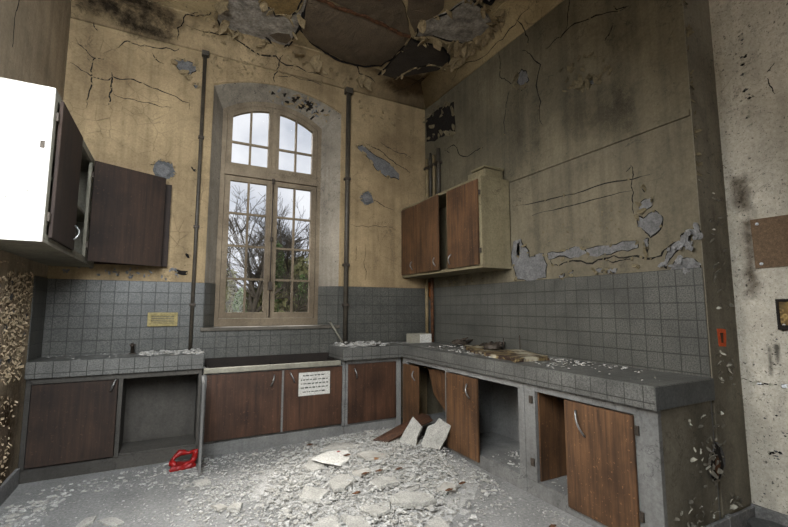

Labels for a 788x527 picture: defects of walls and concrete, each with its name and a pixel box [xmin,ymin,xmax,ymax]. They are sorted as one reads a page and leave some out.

leakage [88,0,174,40]
crack [70,12,334,109]
spalling [189,0,505,91]
crack [452,0,628,135]
spalling [150,158,177,181]
peeling [354,141,399,180]
spalling [422,101,456,143]
peeling [511,185,663,281]
peeling [658,216,725,274]
spalling [0,395,18,483]
spalling [690,411,726,488]
peeling [674,493,744,527]